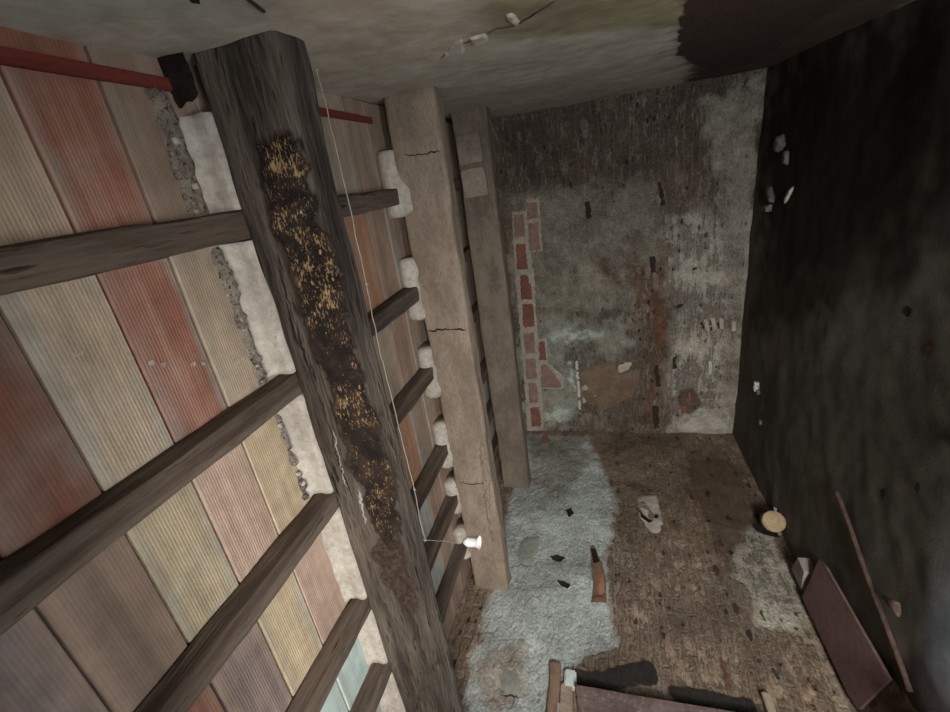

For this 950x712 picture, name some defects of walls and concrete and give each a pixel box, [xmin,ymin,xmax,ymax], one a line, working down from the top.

crack [404,149,441,157]
crack [428,326,465,334]